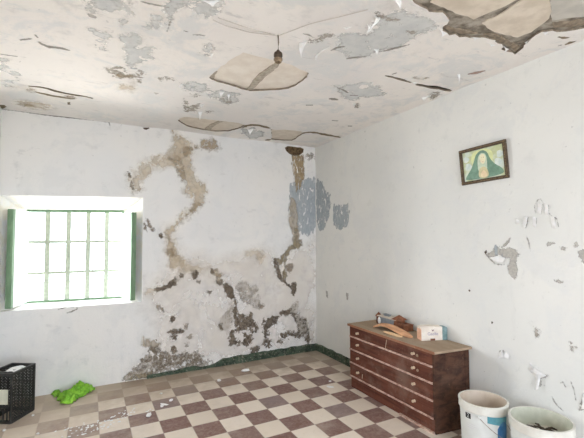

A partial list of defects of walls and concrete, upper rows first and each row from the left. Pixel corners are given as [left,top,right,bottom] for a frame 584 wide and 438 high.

peeling [144,0,224,29]
spalling [299,0,584,60]
crack [36,88,75,99]
peeling [106,33,155,83]
spalling [179,52,308,104]
peeling [329,83,384,108]
crack [394,71,484,101]
damp [156,136,218,220]
peeling [288,177,350,236]
damp [167,242,199,271]
peeling [484,239,518,279]
spalling [123,324,213,381]